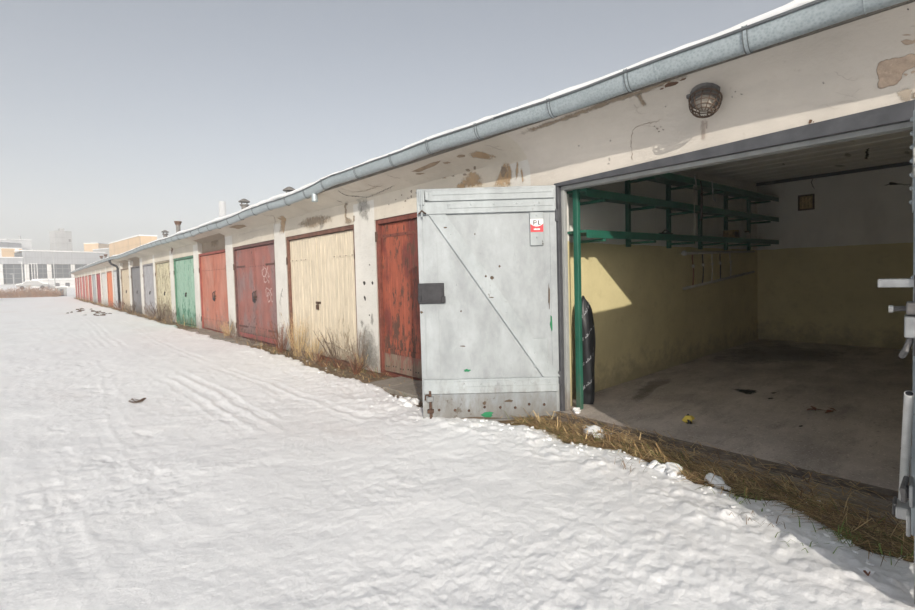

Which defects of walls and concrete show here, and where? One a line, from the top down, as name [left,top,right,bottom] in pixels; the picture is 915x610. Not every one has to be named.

peeling [876,34,915,89]